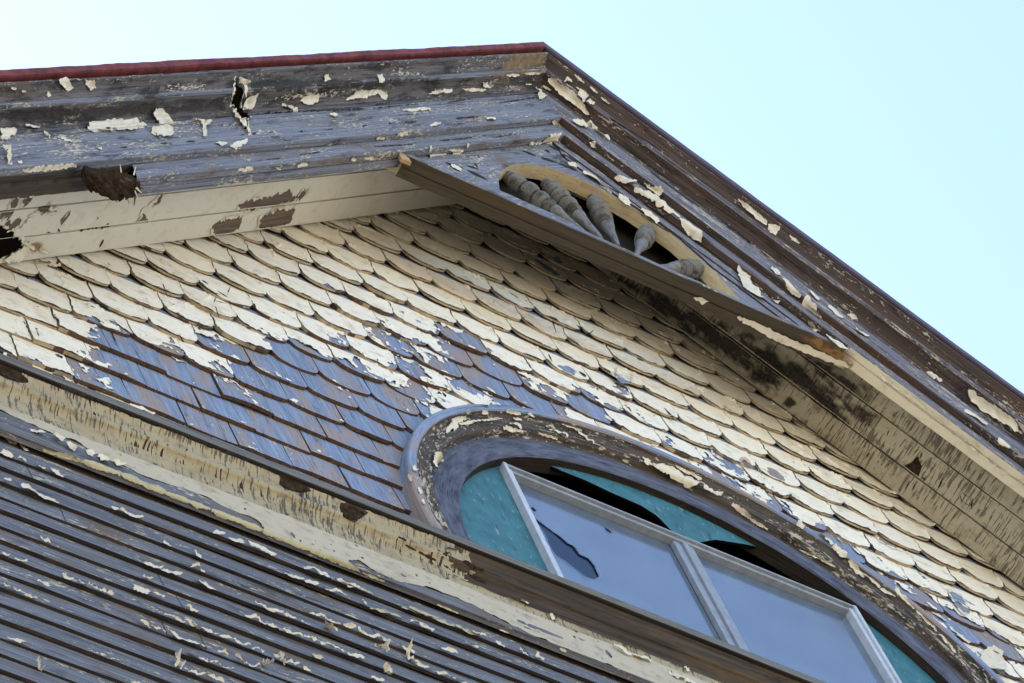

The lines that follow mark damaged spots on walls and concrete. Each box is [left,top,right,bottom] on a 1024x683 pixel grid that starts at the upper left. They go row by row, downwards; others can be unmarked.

peeling [0,124,77,173]
peeling [59,77,96,91]
peeling [86,108,174,136]
peeling [193,77,258,150]
peeling [282,94,319,113]
crack [230,76,488,180]
peeling [346,74,388,100]
peeling [429,143,470,171]
peeling [506,72,610,148]
peeling [568,162,703,243]
peeling [0,188,1024,683]